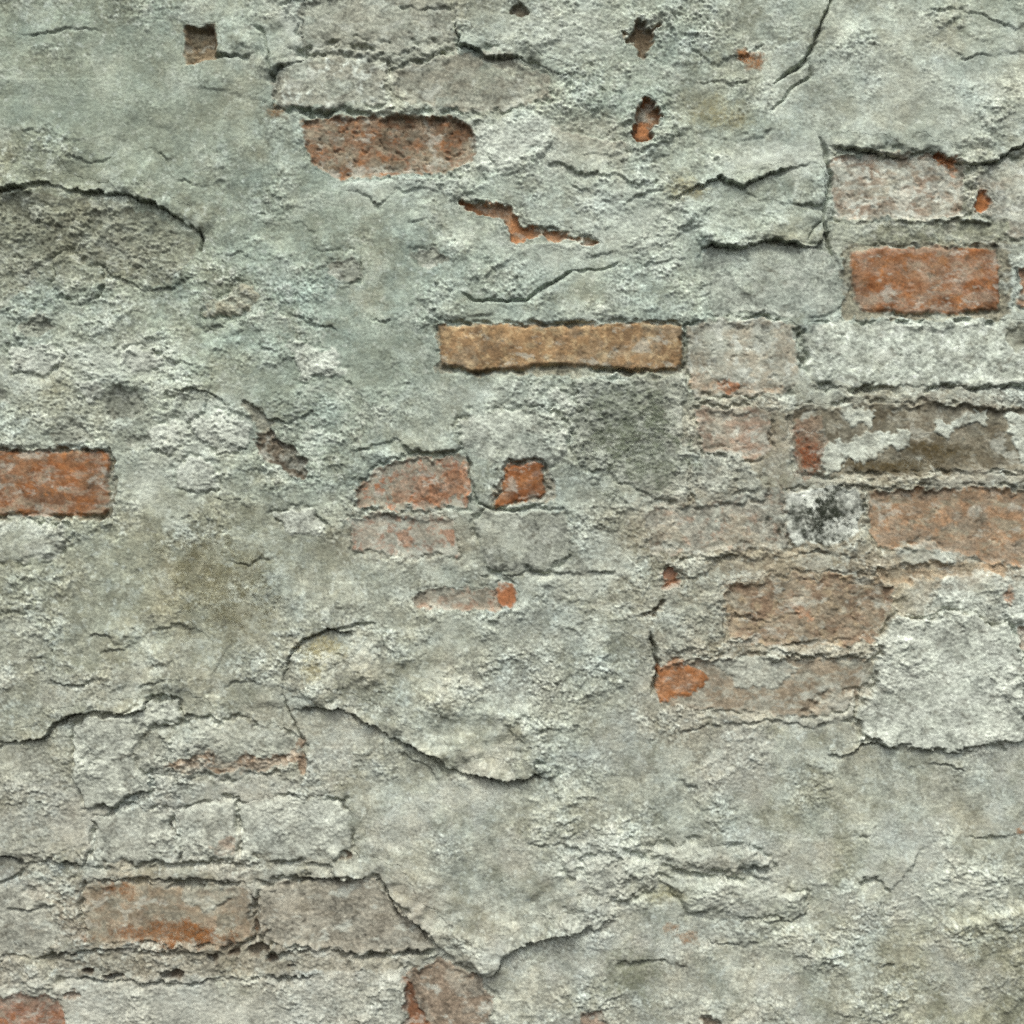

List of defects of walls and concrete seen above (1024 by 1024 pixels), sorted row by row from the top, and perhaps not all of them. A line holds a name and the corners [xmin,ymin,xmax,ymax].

spalling [180,22,222,70]
spalling [254,0,577,186]
spalling [626,93,670,147]
crack [770,0,835,112]
spalling [433,130,1024,573]
spalling [0,445,119,523]
spalling [347,450,474,561]
crack [280,621,380,739]
flaking render [657,564,1024,739]
spalling [0,679,618,1024]